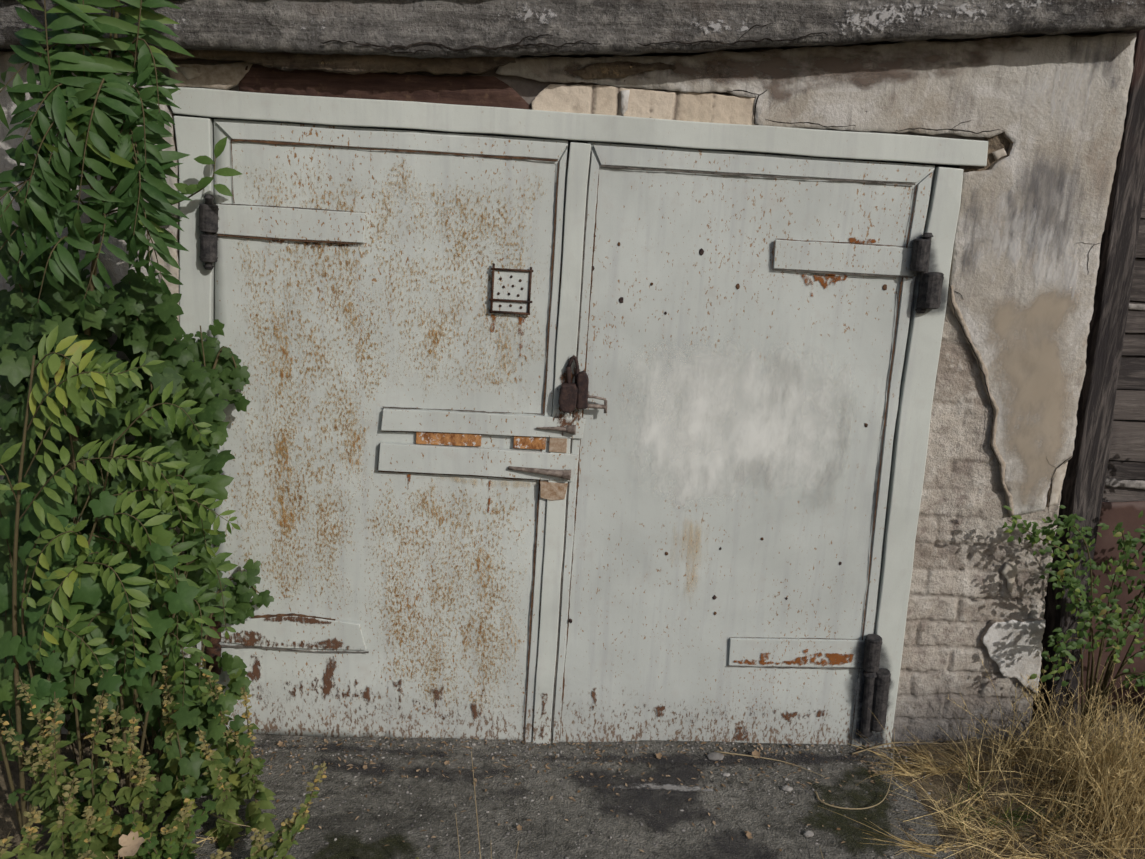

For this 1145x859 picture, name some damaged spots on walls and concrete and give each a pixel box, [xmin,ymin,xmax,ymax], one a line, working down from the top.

crack [320,34,598,54]
crack [637,23,828,46]
corrosion [796,273,848,296]
damp [990,161,1079,496]
corrosion [221,161,544,719]
spalling [891,285,1068,747]
corrosion [734,649,854,666]
corrosion [751,707,825,724]